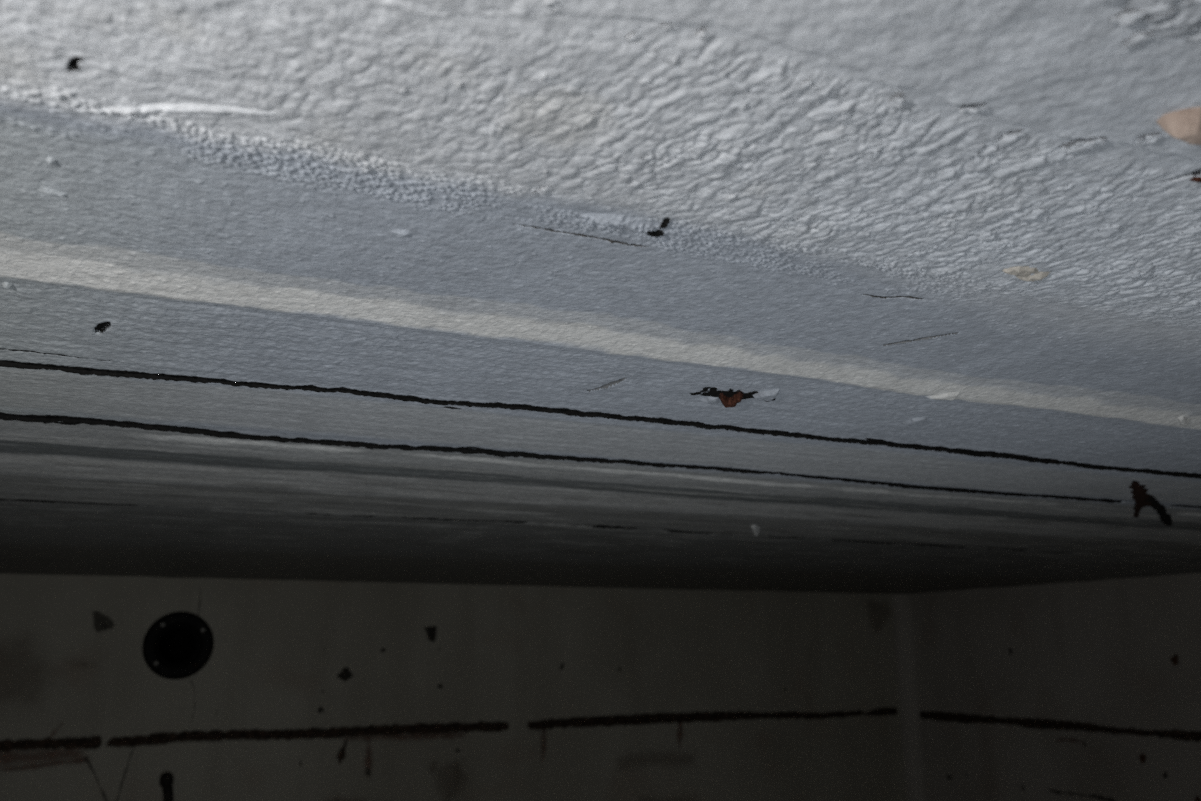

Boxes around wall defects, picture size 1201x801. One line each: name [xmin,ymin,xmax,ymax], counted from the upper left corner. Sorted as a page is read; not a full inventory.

crack [0,322,1201,508]
spalling [1128,481,1172,526]